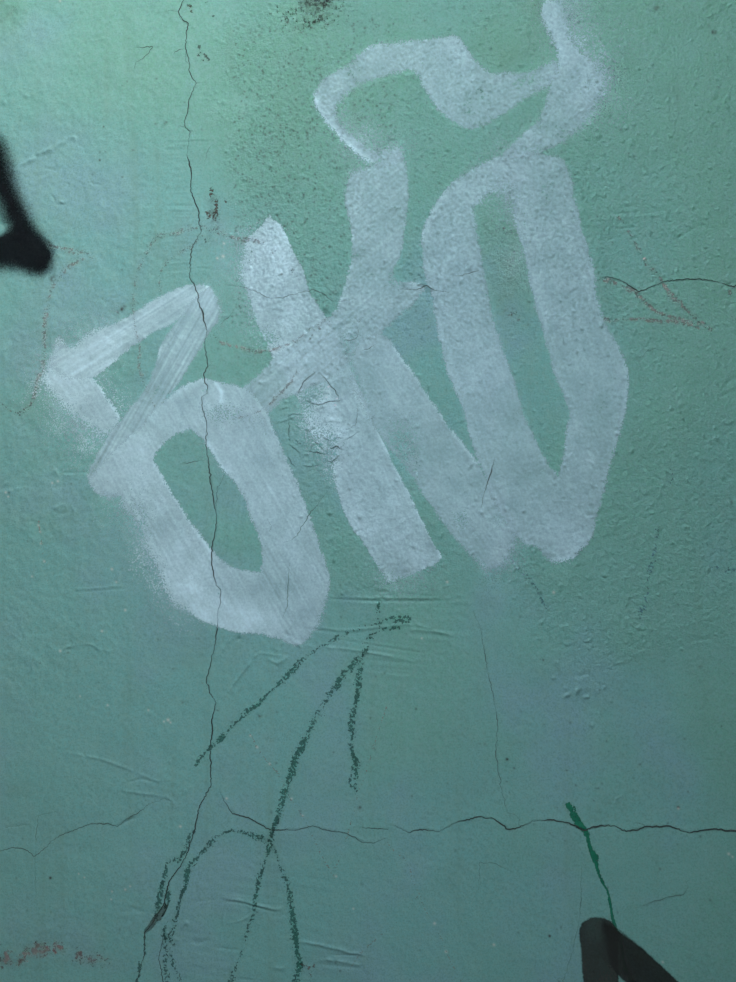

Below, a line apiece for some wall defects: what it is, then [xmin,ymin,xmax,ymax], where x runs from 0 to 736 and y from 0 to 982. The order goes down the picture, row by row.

crack [597,276,736,292]
crack [135,0,388,982]
crack [403,611,736,835]